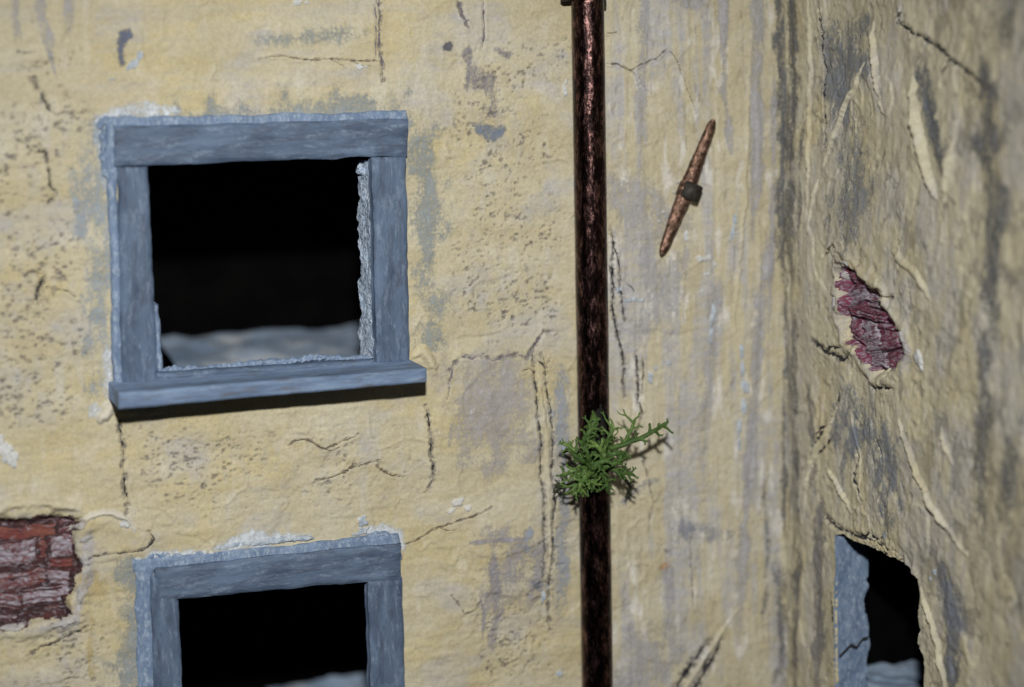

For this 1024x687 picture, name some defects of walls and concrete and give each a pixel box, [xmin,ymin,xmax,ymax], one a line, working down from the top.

crack [263,0,384,82]
water stain [821,13,874,250]
water stain [914,68,942,175]
crack [896,10,983,90]
water stain [970,57,1013,322]
crack [609,225,644,422]
spalling [832,261,923,371]
crack [288,434,401,480]
crack [426,331,557,618]
water stain [761,304,827,686]
water stain [831,387,902,532]
spalling [0,513,93,633]